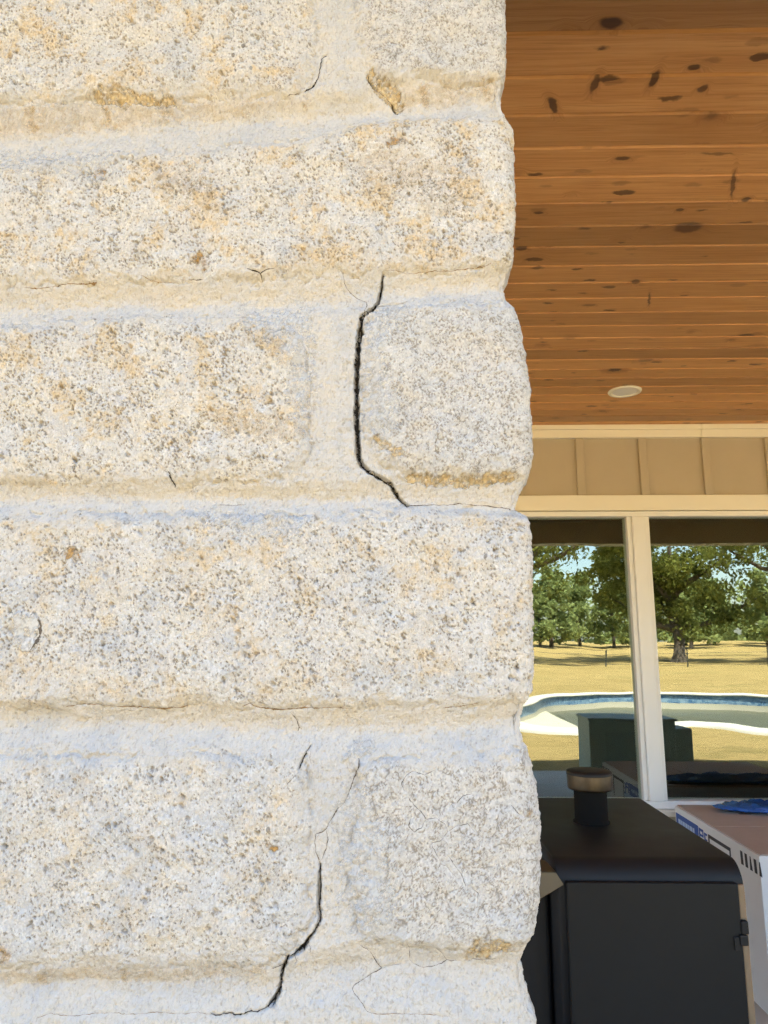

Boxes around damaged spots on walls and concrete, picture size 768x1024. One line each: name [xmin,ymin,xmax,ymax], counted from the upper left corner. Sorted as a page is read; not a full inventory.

crack [287,56,327,97]
spalling [367,69,404,115]
crack [343,263,491,507]
crack [63,702,188,710]
crack [244,703,353,786]
crack [120,760,360,1016]